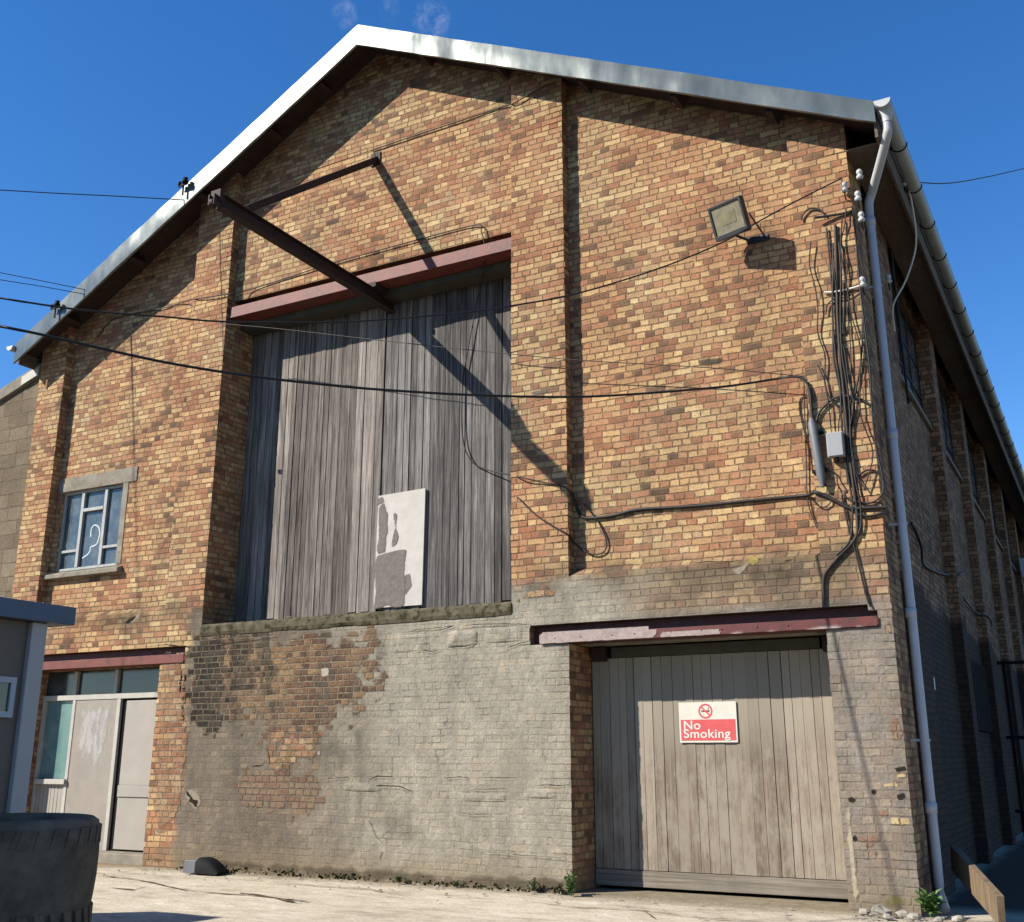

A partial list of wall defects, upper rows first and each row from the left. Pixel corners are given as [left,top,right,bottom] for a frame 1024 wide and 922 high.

peeling [153,616,388,833]